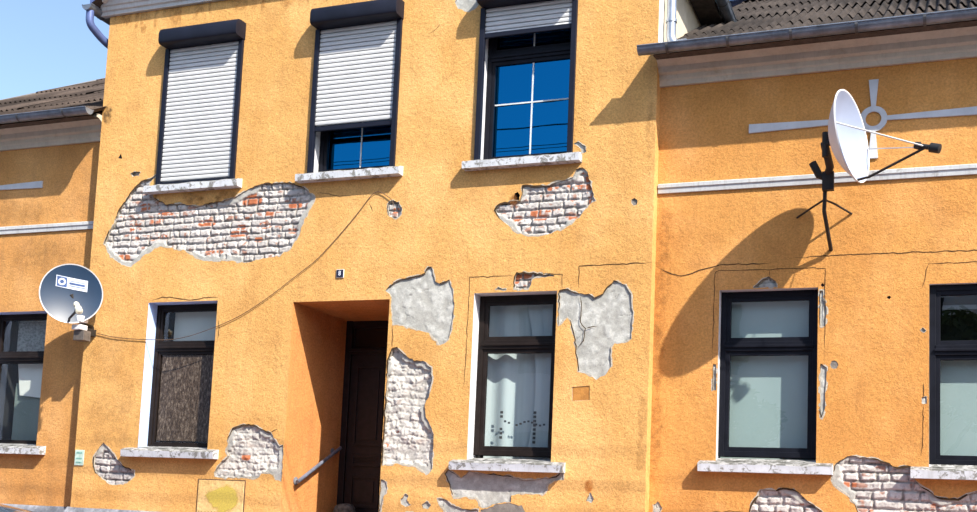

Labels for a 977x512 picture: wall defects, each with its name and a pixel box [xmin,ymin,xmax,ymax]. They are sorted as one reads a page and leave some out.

spalling [103,171,316,267]
spalling [494,167,596,237]
spalling [385,266,455,345]
crack [464,275,513,377]
spalling [557,280,634,380]
crack [541,250,977,363]
spalling [381,347,434,475]
spalling [92,442,135,485]
spalling [214,423,284,482]
spalling [400,470,565,512]
spalling [749,488,823,512]
spalling [830,455,977,512]